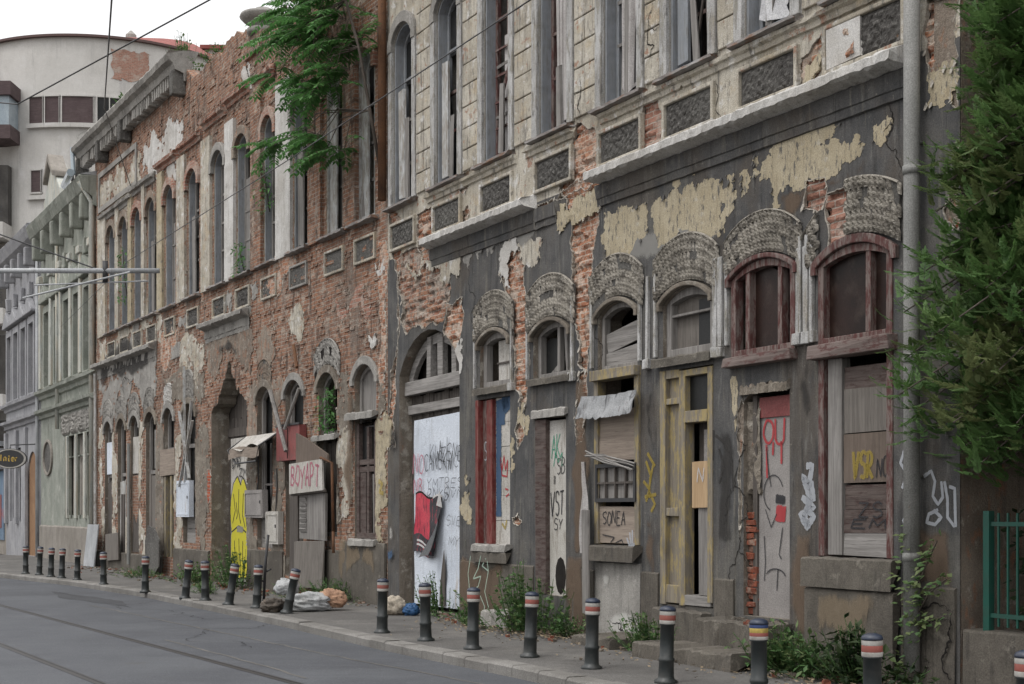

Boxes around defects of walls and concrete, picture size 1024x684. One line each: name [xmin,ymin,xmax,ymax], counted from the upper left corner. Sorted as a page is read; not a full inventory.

flaking render [799,34,822,85]
peeling [922,0,960,111]
peeling [100,116,184,224]
peeling [537,115,894,446]
flaking render [335,204,543,543]
flaking render [730,376,763,535]